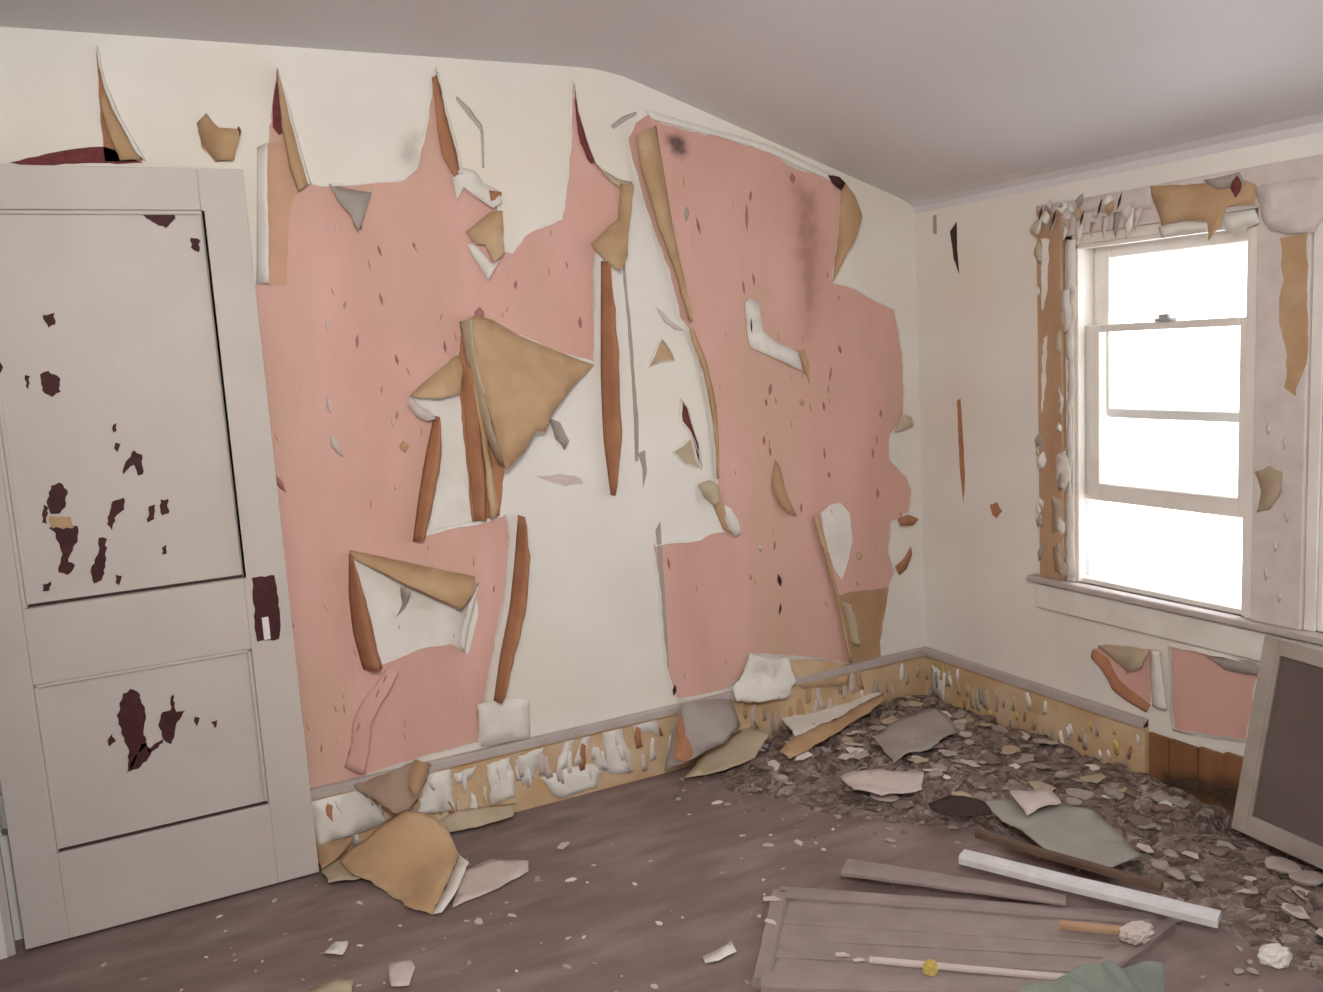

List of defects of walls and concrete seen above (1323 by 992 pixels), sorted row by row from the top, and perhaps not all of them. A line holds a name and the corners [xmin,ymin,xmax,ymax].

peeling [144,215,176,228]
peeling [1150,172,1260,241]
peeling [43,313,56,328]
peeling [1279,234,1309,396]
peeling [25,371,61,397]
peeling [112,423,144,476]
peeling [252,67,1140,847]
peeling [42,482,79,591]
peeling [91,498,125,585]
peeling [147,499,169,522]
peeling [108,689,217,773]
peeling [1167,643,1260,743]